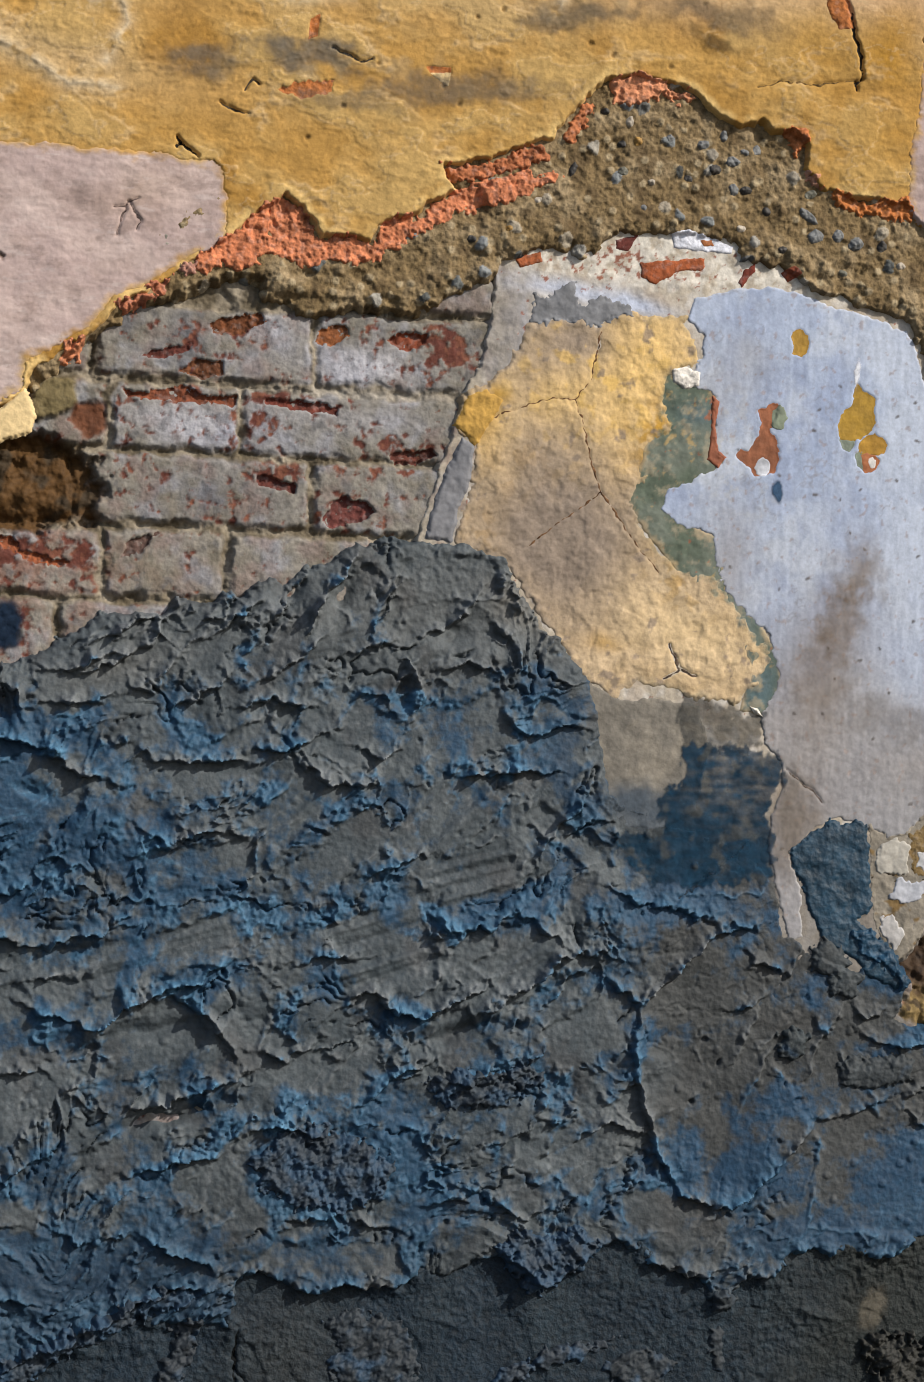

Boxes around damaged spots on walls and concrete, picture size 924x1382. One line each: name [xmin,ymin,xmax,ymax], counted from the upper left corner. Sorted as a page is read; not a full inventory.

crack [758,0,864,91]
flaking render [427,66,451,86]
flaking render [0,70,924,443]
peeling [838,383,887,473]
spalling [256,475,296,494]
spalling [322,496,374,529]
peeling [389,281,788,717]
spalling [0,535,69,567]
spalling [121,531,160,558]